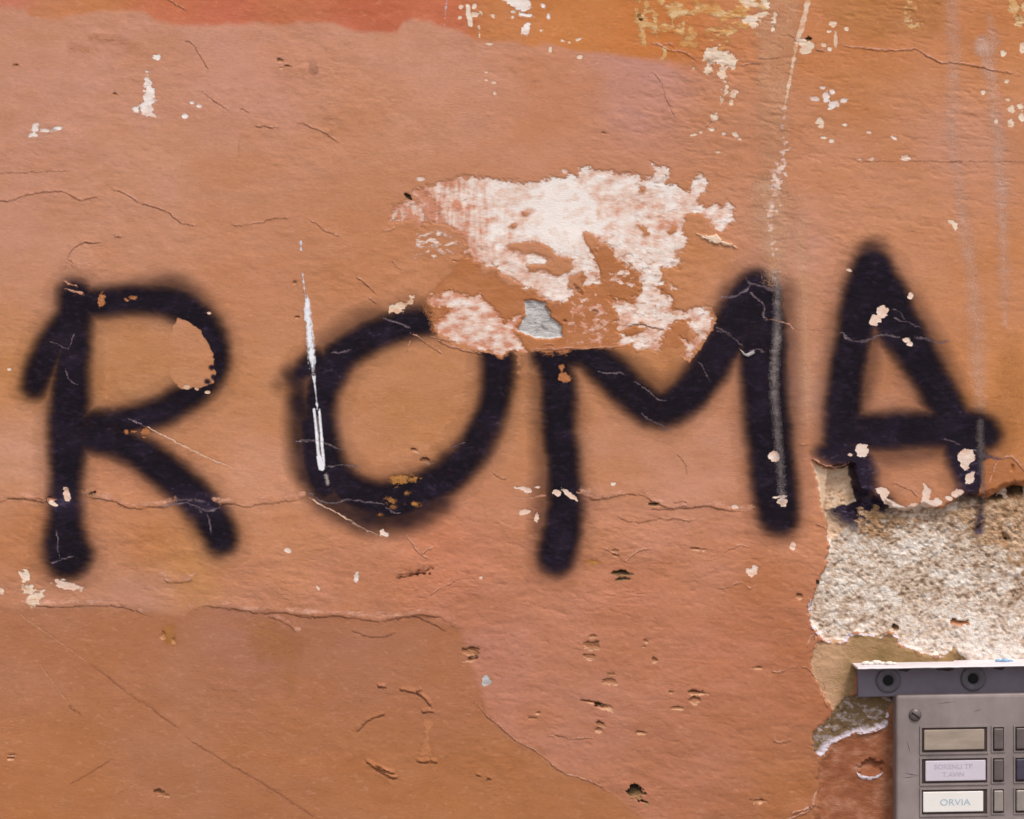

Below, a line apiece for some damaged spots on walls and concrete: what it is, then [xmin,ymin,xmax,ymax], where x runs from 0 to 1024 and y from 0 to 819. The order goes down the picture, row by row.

crack [744,33,1017,77]
peeling [132,70,157,118]
peeling [810,86,847,143]
crack [0,169,196,225]
peeling [387,163,737,383]
peeling [165,318,216,394]
crack [296,439,357,468]
crack [160,498,221,531]
crack [306,492,433,557]
flaking render [808,443,1024,819]